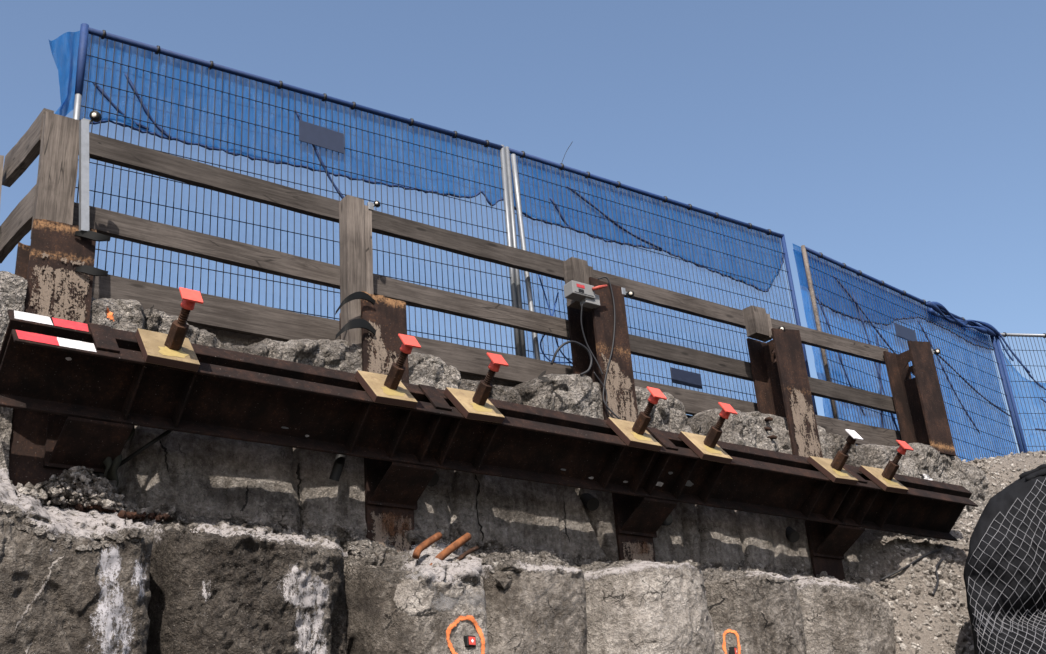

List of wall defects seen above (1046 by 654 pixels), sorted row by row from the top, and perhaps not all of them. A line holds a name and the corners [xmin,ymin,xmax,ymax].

spalling [0,468,163,558]
crack [295,463,303,510]
efflorescence [89,547,146,654]
efflorescence [280,565,329,654]
spalling [193,511,730,616]
spalling [739,563,867,589]